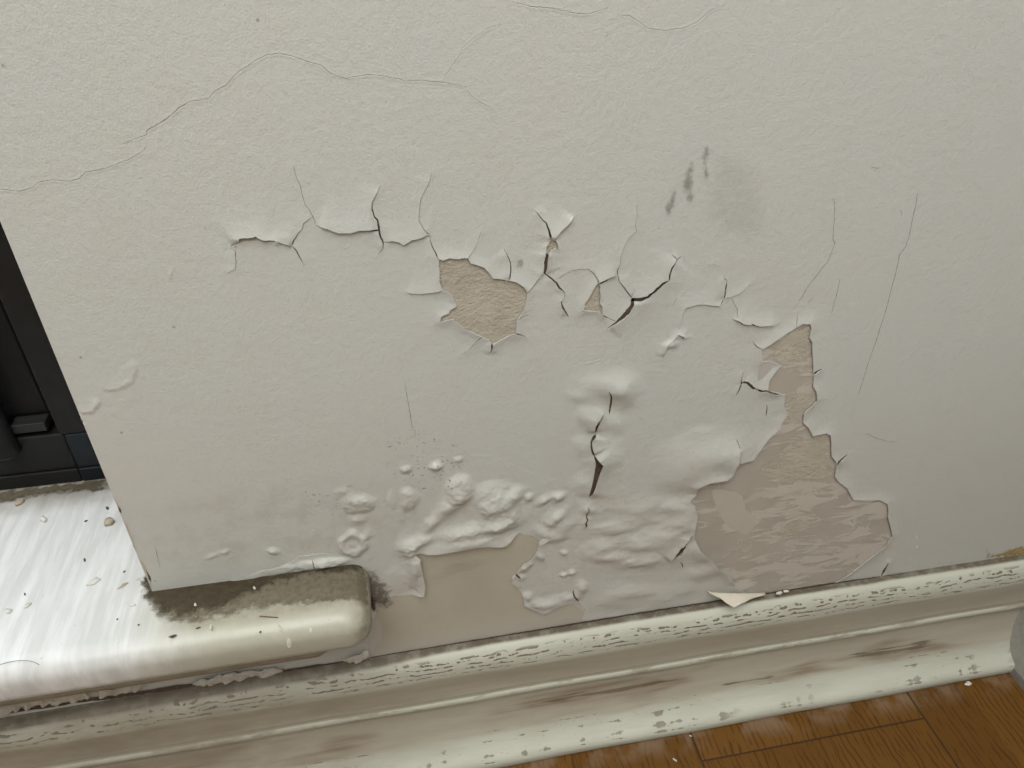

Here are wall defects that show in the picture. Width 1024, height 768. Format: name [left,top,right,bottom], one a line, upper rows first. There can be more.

crack [0,1,725,194]
spalling [383,146,555,380]
crack [498,171,772,370]
crack [790,193,918,443]
spalling [666,288,917,608]
peeling [0,684,143,718]
peeling [192,668,283,687]
peeling [543,680,672,703]
peeling [851,640,929,657]